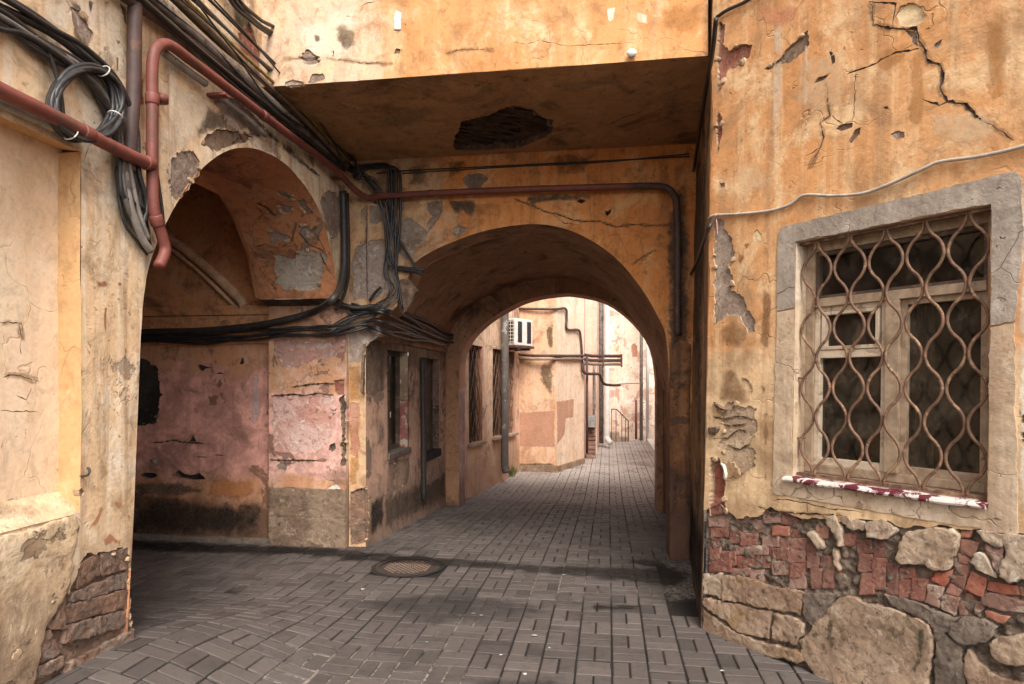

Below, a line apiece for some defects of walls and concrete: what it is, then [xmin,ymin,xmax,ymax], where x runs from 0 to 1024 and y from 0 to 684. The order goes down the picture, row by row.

spalling [714,22,752,93]
spalling [764,30,809,70]
crack [807,1,1014,170]
spalling [168,92,267,204]
crack [515,199,670,264]
spalling [97,356,163,426]
crack [272,383,334,397]
crack [151,439,224,458]
crack [270,456,326,464]
leakage [133,483,260,534]
flaking render [702,400,1024,684]
spalling [11,547,135,684]